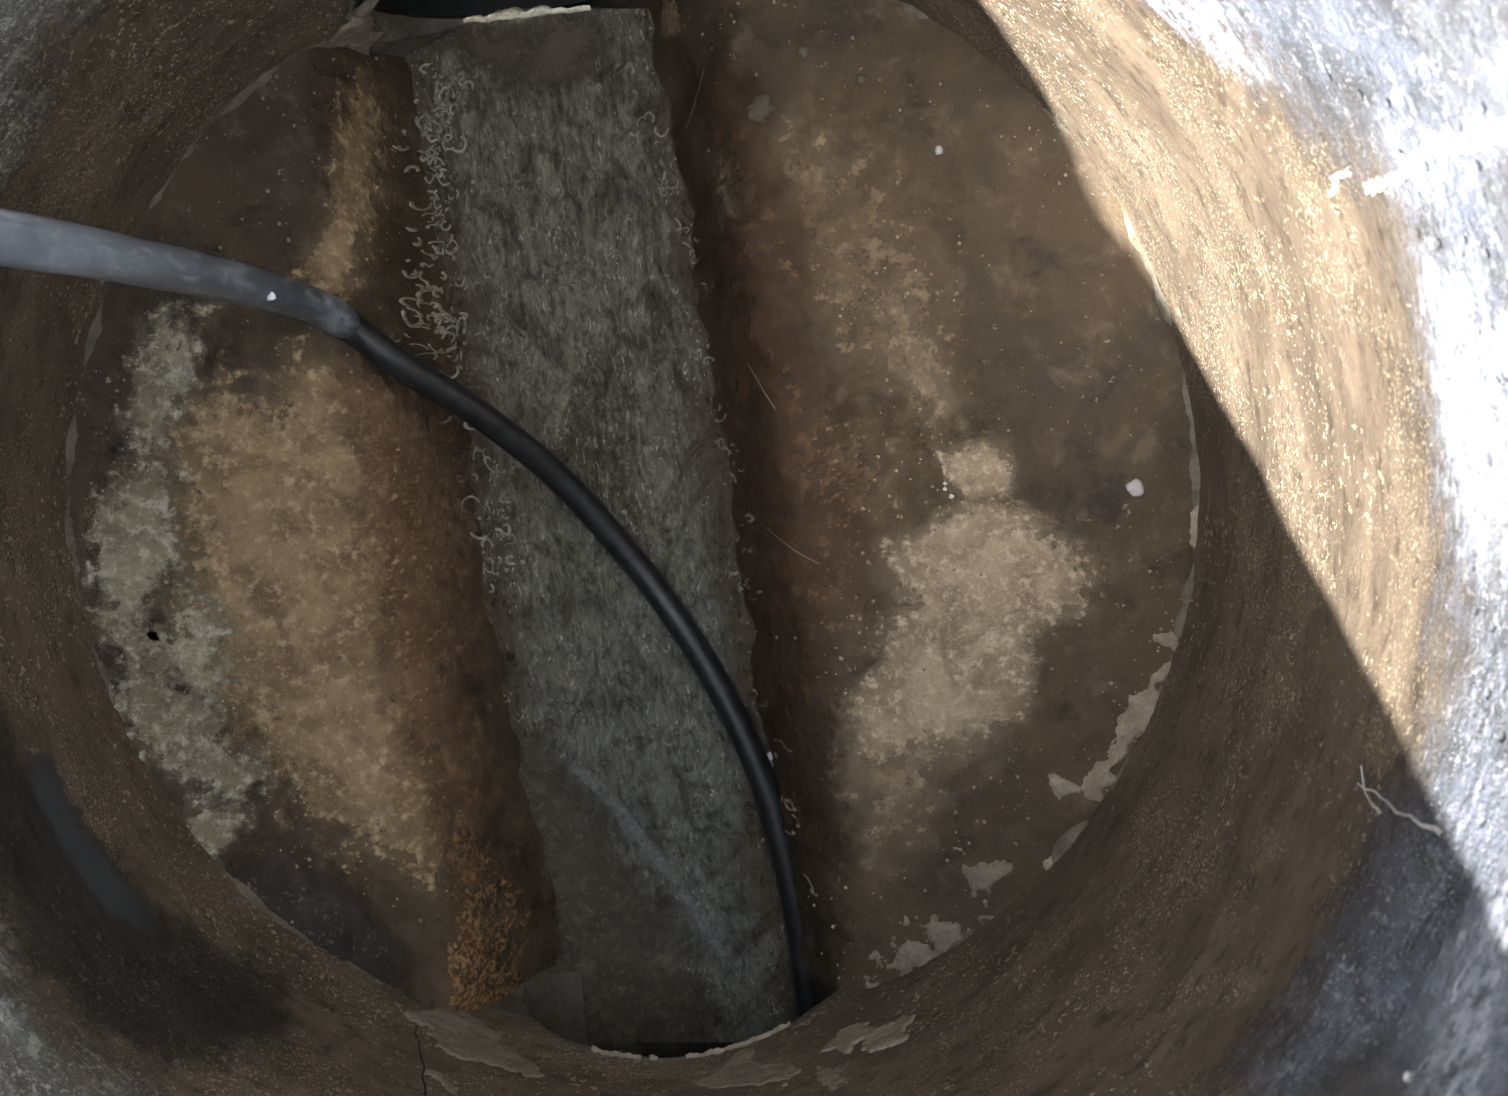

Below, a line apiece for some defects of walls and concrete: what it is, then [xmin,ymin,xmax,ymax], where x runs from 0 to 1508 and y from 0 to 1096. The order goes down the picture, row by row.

crack [1327,114,1508,197]
crack [415,1025,427,1096]